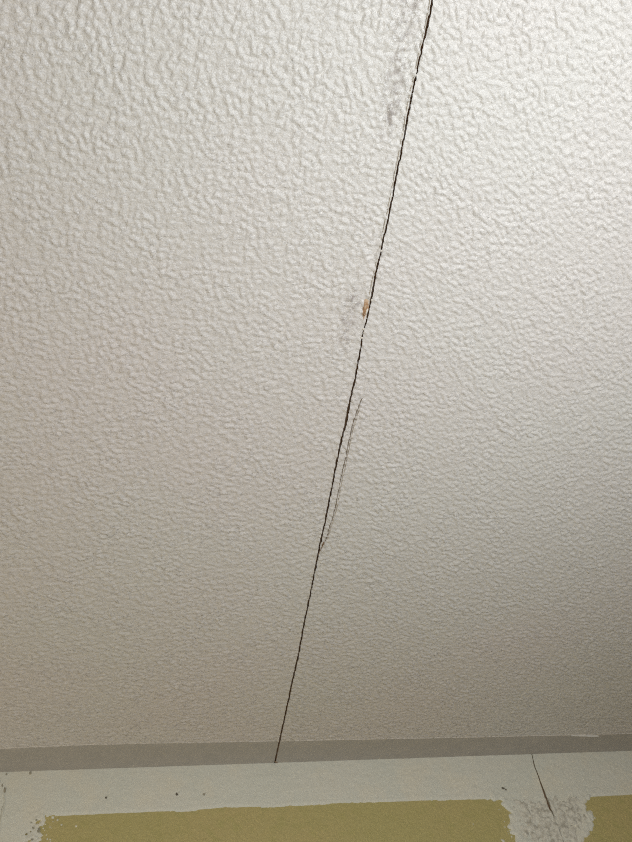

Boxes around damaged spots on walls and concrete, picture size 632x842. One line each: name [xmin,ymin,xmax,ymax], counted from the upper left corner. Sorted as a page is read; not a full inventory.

crack [274,0,433,763]
crack [532,757,563,840]